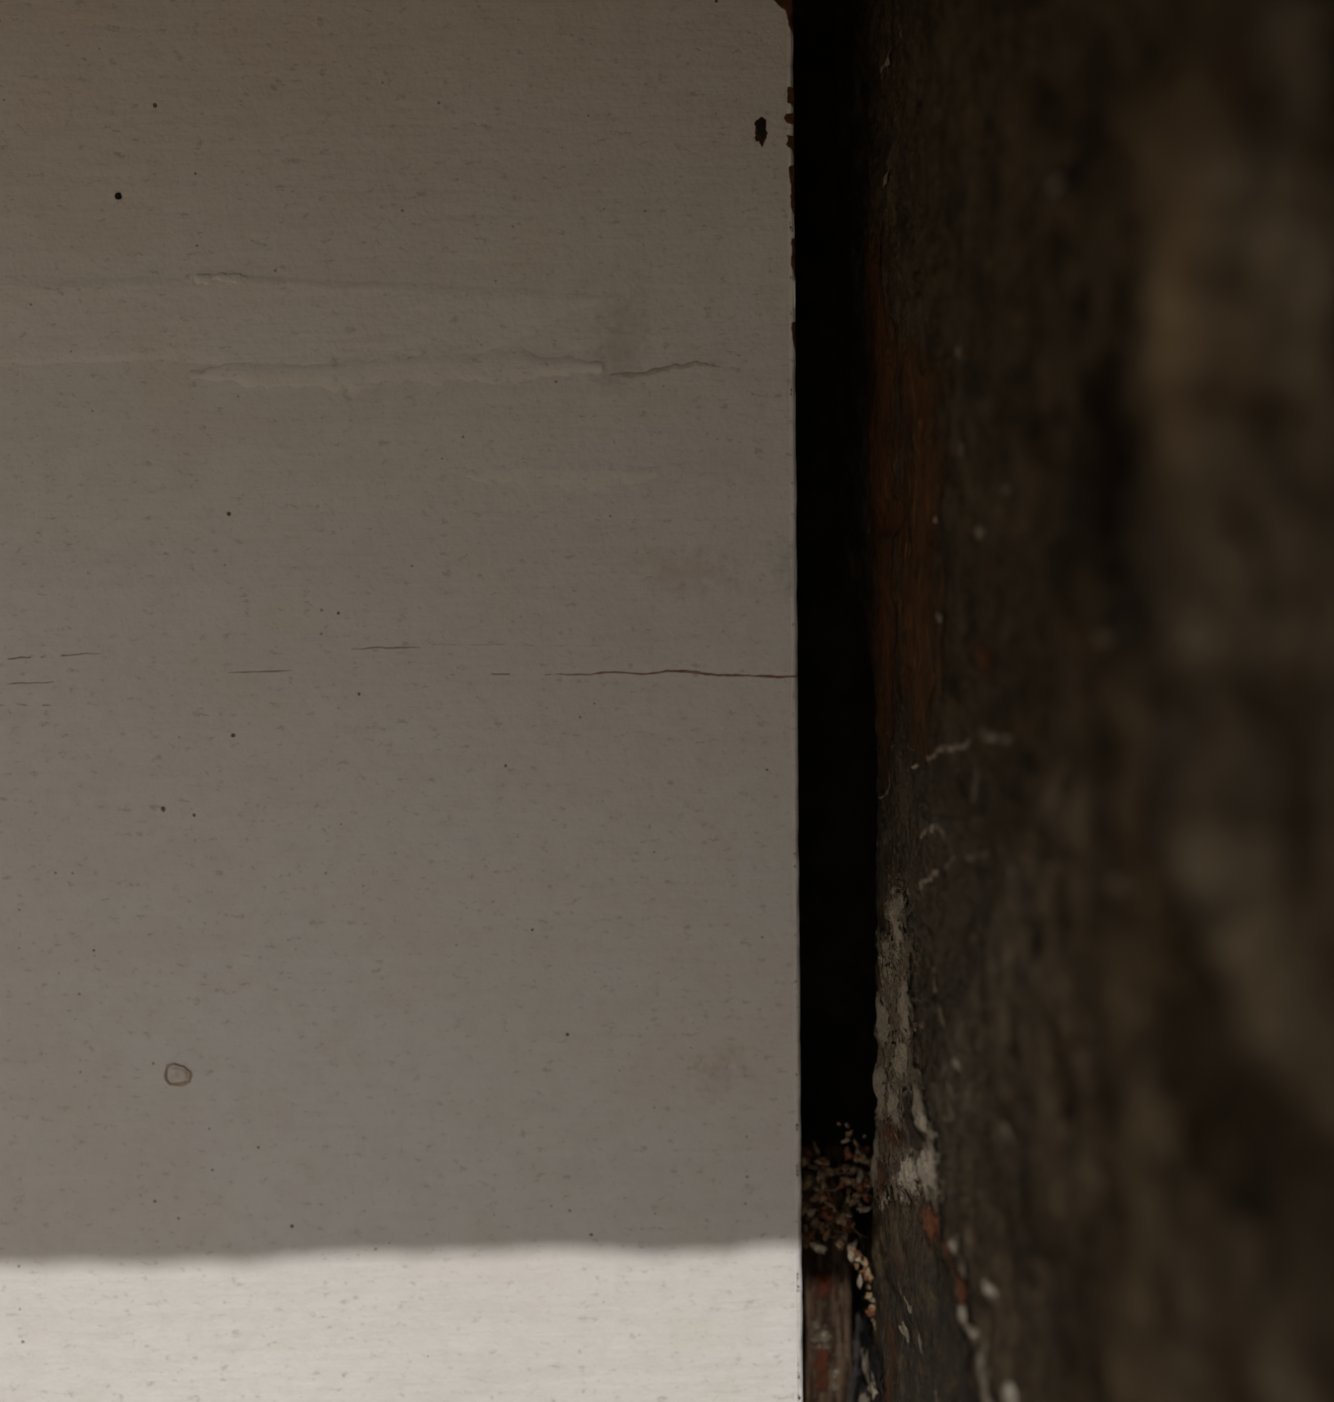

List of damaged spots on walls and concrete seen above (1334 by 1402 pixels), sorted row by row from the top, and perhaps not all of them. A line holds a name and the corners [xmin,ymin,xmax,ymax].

peeling [773,0,793,35]
crack [351,644,420,652]
crack [0,653,102,706]
crack [228,667,291,675]
crack [547,670,798,679]
water stain [871,1204,982,1402]